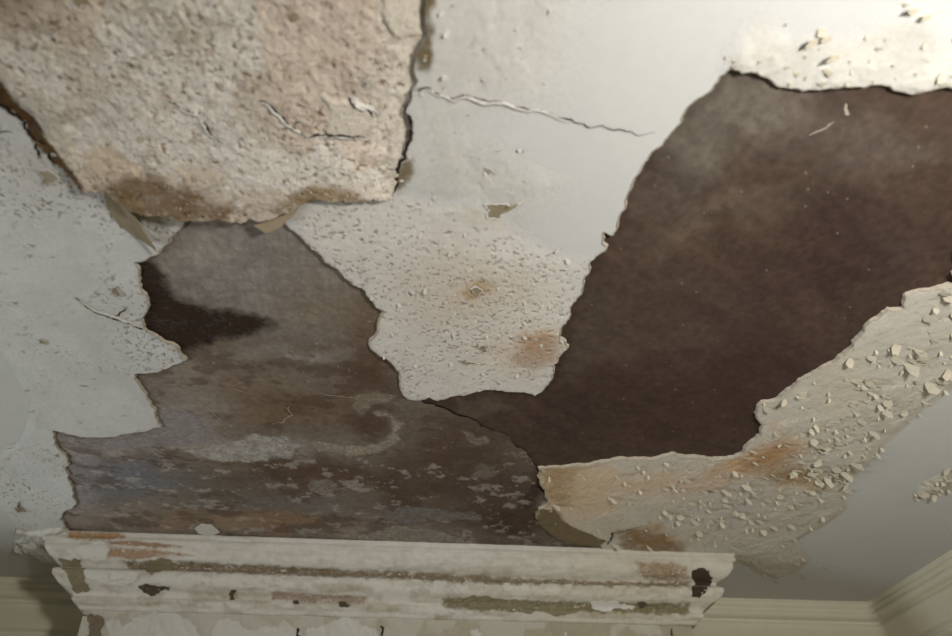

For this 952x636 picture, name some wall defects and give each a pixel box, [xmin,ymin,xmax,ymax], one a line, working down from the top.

crack [164,99,223,147]
crack [258,95,380,141]
crack [392,87,652,196]
flaking render [422,0,952,477]
flaking render [0,0,610,549]
peeling [538,288,952,584]
peeling [138,558,173,596]
peeling [83,601,378,636]
peeling [466,595,572,617]